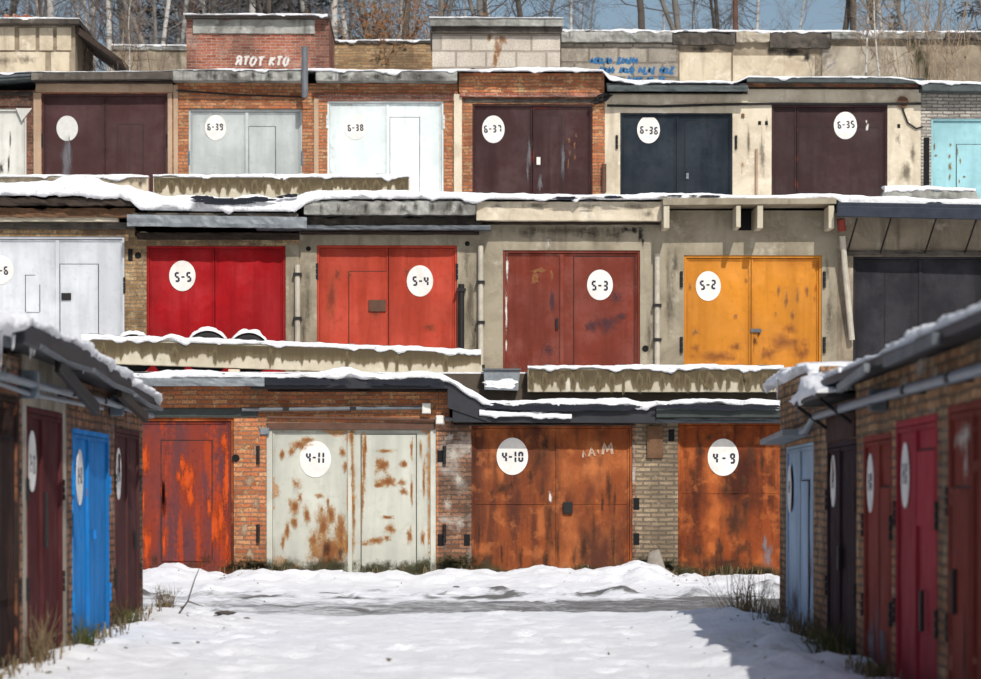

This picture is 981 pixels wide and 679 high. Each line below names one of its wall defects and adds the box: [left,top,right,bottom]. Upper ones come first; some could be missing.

water stain [90,326,481,372]
water stain [528,370,779,394]
rust [280,430,425,569]
rust [529,439,559,566]
rust [601,476,616,511]
rust [482,546,503,569]
rust [690,499,752,570]